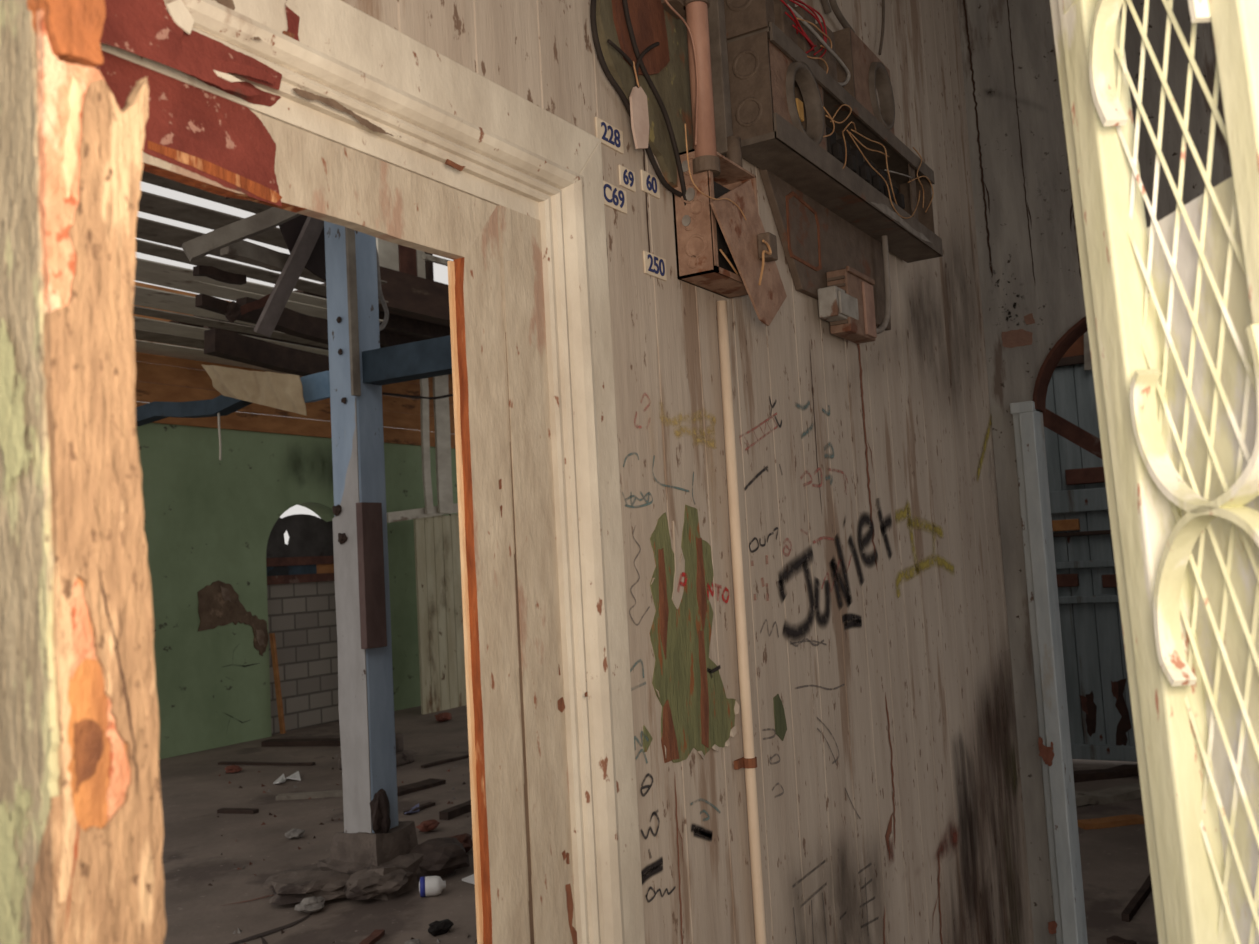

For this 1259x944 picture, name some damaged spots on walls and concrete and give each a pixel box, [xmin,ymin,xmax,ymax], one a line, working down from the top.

peeling [36,0,401,313]
peeling [445,159,465,171]
peeling [0,318,35,496]
peeling [0,784,32,944]
spalling [67,577,130,831]
spalling [198,580,268,656]
peeling [643,505,739,763]
damp [954,674,1023,944]